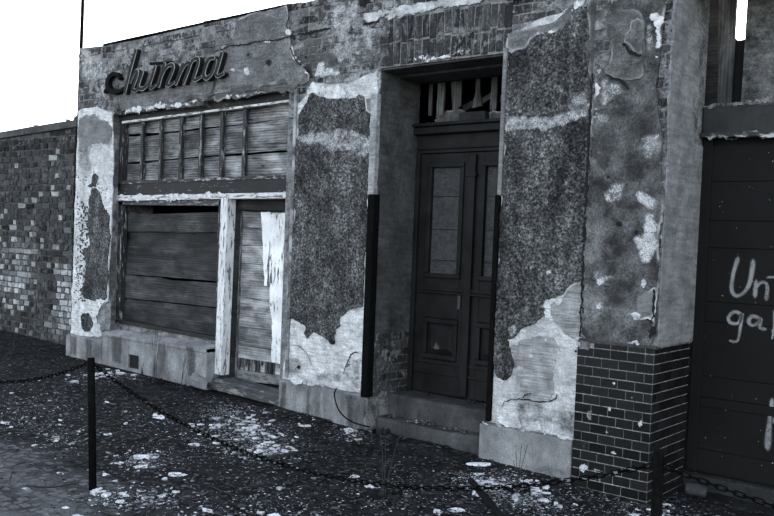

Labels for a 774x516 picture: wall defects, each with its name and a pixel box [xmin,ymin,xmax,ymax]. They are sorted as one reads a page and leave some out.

peeling [359,0,482,25]
peeling [507,0,589,51]
peeling [125,100,197,115]
peeling [74,173,111,332]
peeling [261,212,285,364]
peeling [543,283,583,339]
peeling [510,335,561,403]
peeling [497,412,522,429]
crack [502,393,557,406]